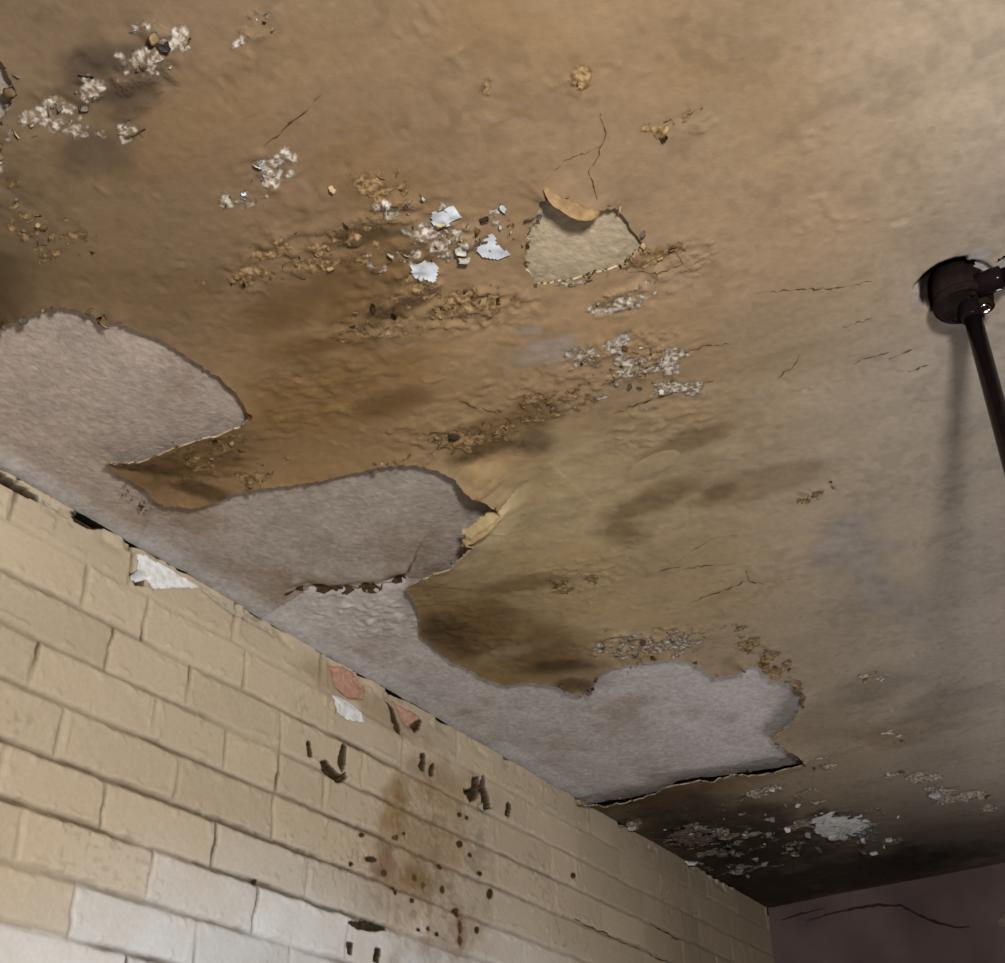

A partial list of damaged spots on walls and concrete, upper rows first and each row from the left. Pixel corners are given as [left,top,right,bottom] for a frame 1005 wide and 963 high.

peeling [114,22,191,83]
peeling [0,61,106,263]
peeling [117,120,146,144]
flaking render [228,170,691,344]
flaking render [0,306,838,804]
hole [463,776,490,813]
peeling [663,781,904,878]
crack [780,903,970,928]